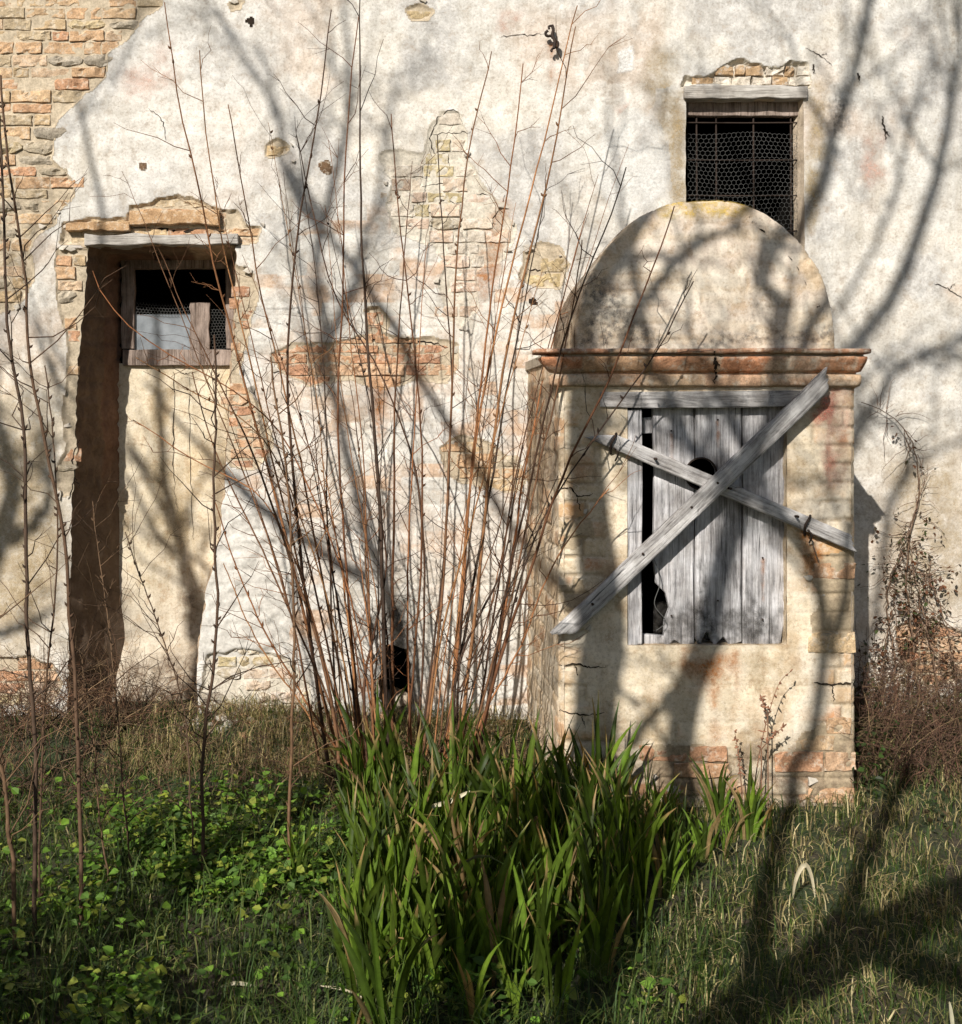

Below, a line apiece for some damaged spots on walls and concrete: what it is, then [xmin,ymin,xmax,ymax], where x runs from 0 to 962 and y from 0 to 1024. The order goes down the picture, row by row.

spalling [405,0,435,21]
spalling [680,58,812,88]
spalling [265,137,295,162]
spalling [318,160,332,175]
spalling [378,111,571,331]
flaking render [0,0,265,500]
spalling [271,306,471,390]
crack [562,487,593,511]
crack [558,663,606,676]
crack [814,682,853,701]
crack [559,709,605,728]